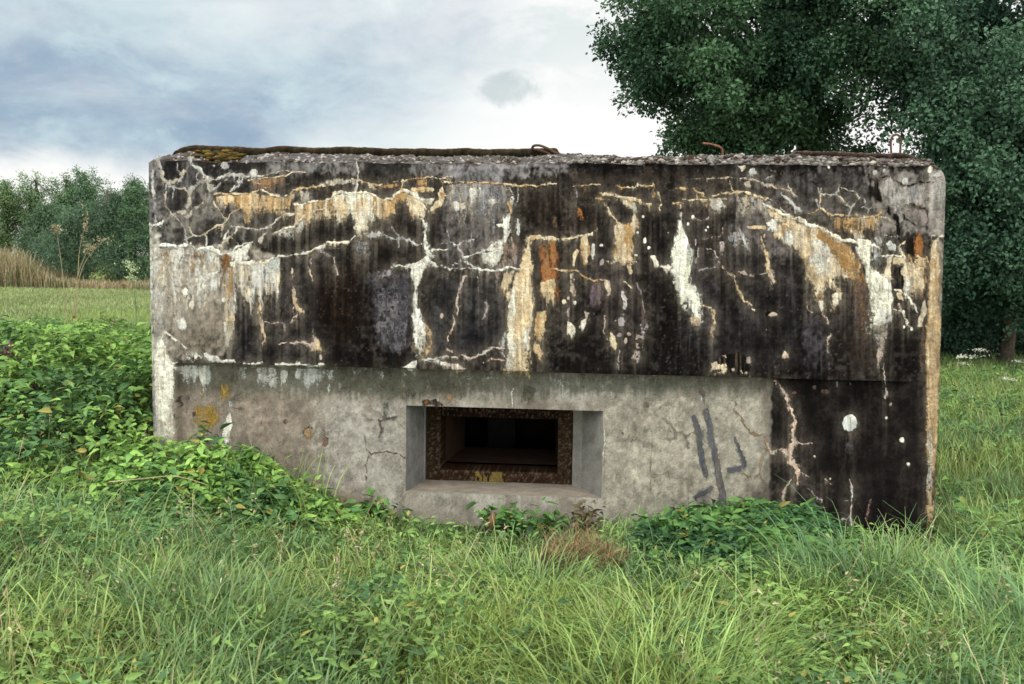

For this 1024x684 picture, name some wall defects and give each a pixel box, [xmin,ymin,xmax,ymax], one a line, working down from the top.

water stain [150,241,342,438]
crack [149,156,520,374]
water stain [274,181,547,407]
rust [525,190,598,305]
water stain [562,192,652,370]
water stain [650,204,702,326]
crack [693,210,775,311]
crack [696,161,876,218]
water stain [712,178,944,523]
rust [808,208,931,295]
peeling [867,164,941,229]
crack [733,380,871,526]